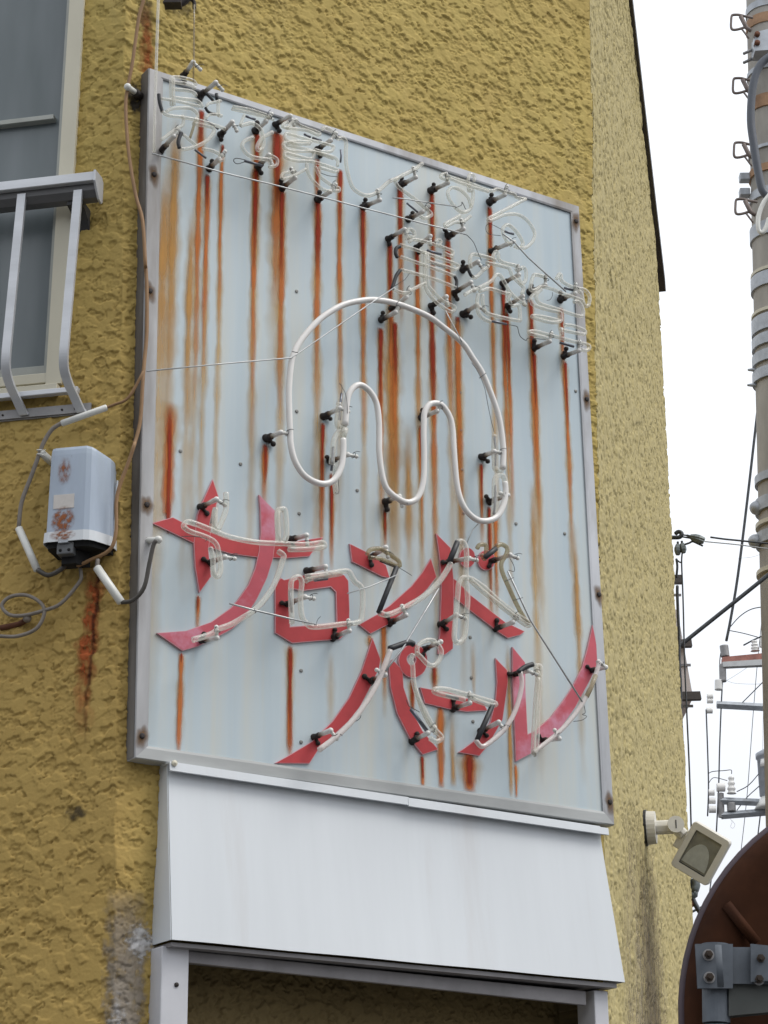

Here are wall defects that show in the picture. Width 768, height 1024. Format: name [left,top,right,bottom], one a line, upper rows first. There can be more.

rust [156,393,174,532]
rust [186,111,224,387]
rust [250,134,259,365]
rust [272,133,285,381]
rust [317,420,334,539]
rust [379,188,403,463]
rust [407,194,462,490]
rust [488,208,512,444]
rust [529,300,540,514]
rust [563,362,571,513]
rust [438,707,474,789]
flaking render [103,916,154,1024]